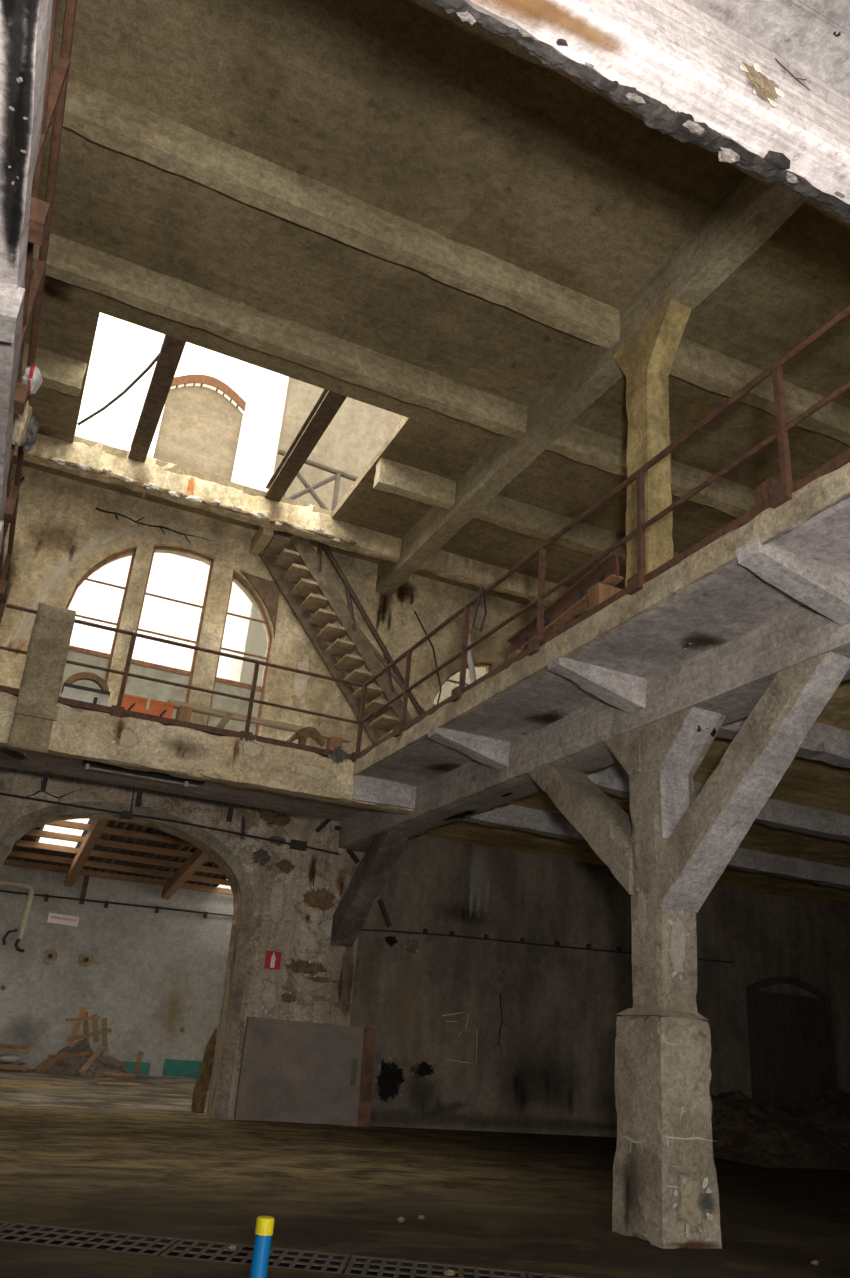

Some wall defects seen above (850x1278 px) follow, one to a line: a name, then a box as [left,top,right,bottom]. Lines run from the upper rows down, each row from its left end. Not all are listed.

damp [1,0,40,261]
spalling [429,0,850,224]
spalling [374,1057,438,1104]
peeling [673,1170,713,1238]